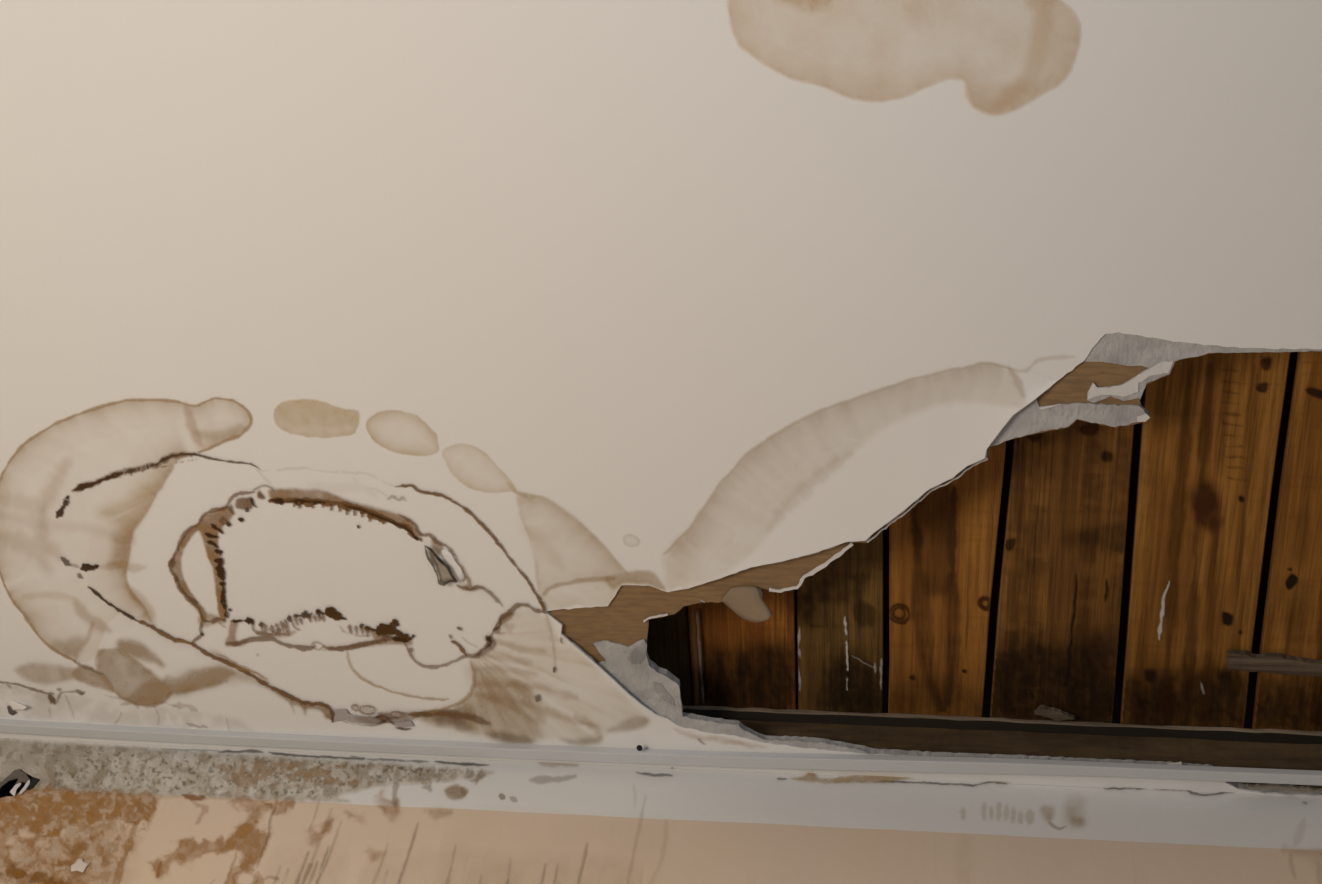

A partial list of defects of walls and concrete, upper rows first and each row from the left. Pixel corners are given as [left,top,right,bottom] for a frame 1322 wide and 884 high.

damp [0,398,259,518]
damp [0,484,544,730]
hole [0,769,40,796]
peeling [71,858,89,873]